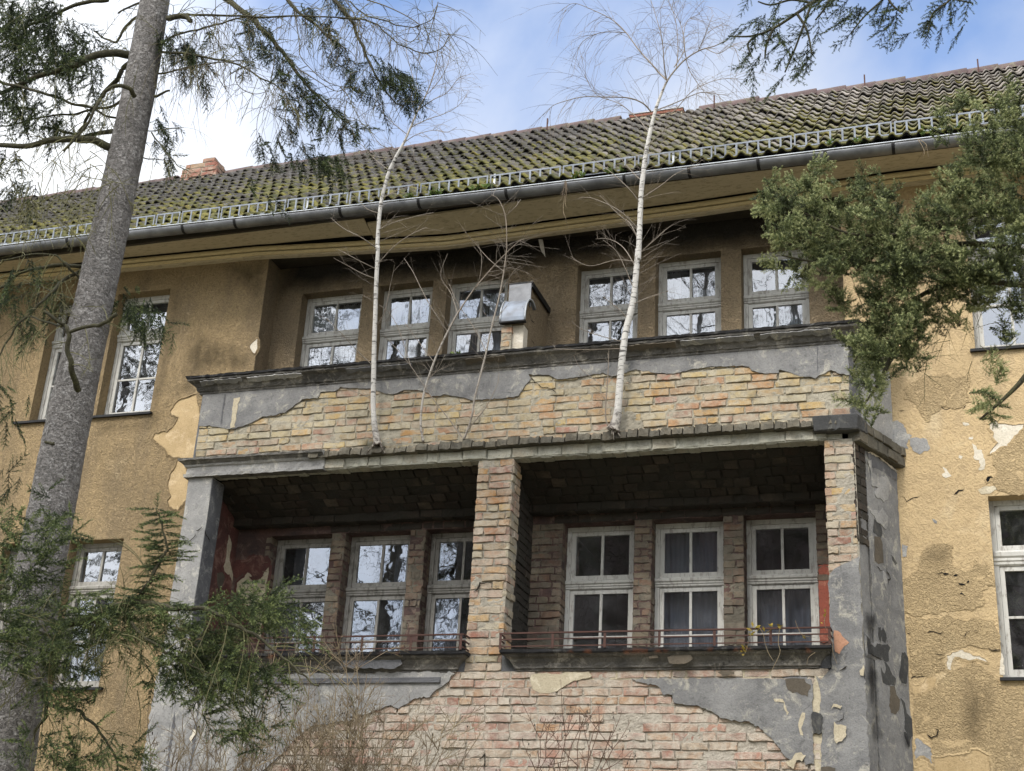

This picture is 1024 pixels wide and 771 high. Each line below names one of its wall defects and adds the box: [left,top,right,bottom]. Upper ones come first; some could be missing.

spalling [248,337,260,355]
spalling [151,366,850,512]
flaking render [959,418,1024,496]
peeling [222,532,272,642]
spalling [833,630,849,654]
flaking render [860,543,1024,771]
spalling [264,654,835,771]
flaking render [834,722,846,744]